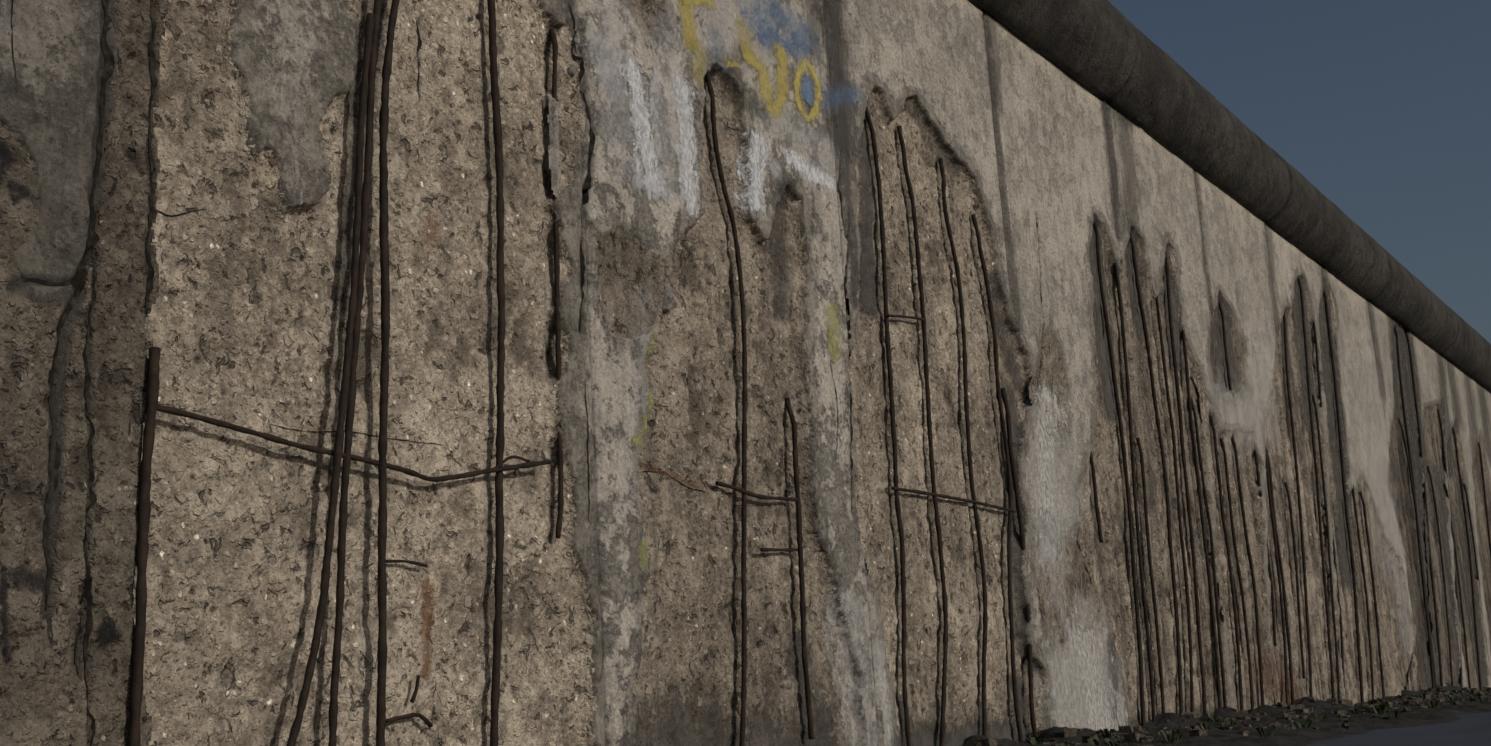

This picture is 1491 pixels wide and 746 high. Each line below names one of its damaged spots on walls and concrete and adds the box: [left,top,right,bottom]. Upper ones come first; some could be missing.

crack [9,0,204,746]
spalling [0,0,600,746]
spalling [595,51,865,746]
damp [631,0,1146,746]
spalling [848,88,1491,746]